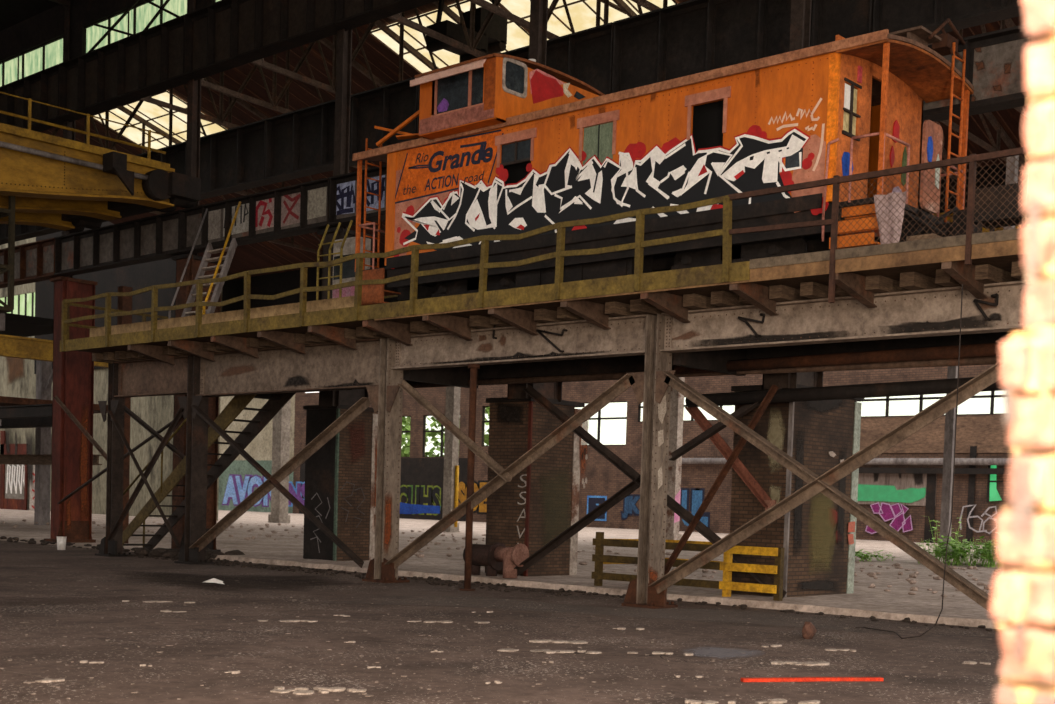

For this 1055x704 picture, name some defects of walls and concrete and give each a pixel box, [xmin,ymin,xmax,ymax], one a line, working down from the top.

damp [888,313,1001,334]
damp [699,332,846,347]